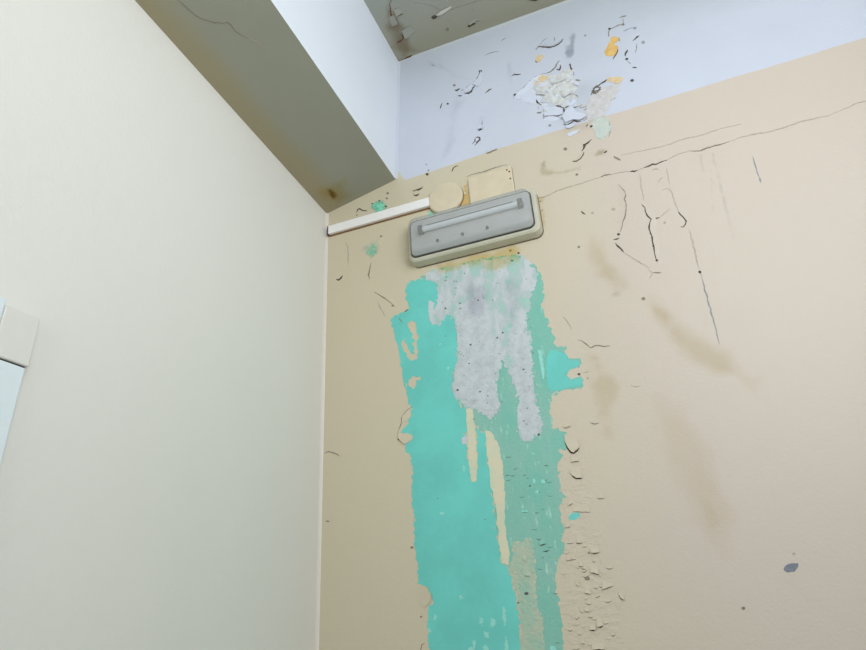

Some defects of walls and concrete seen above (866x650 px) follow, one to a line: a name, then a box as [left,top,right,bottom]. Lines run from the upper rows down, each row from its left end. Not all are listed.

peeling [535,37,563,62]
peeling [604,15,627,59]
peeling [514,60,623,141]
crack [539,101,866,344]
peeling [390,254,628,650]